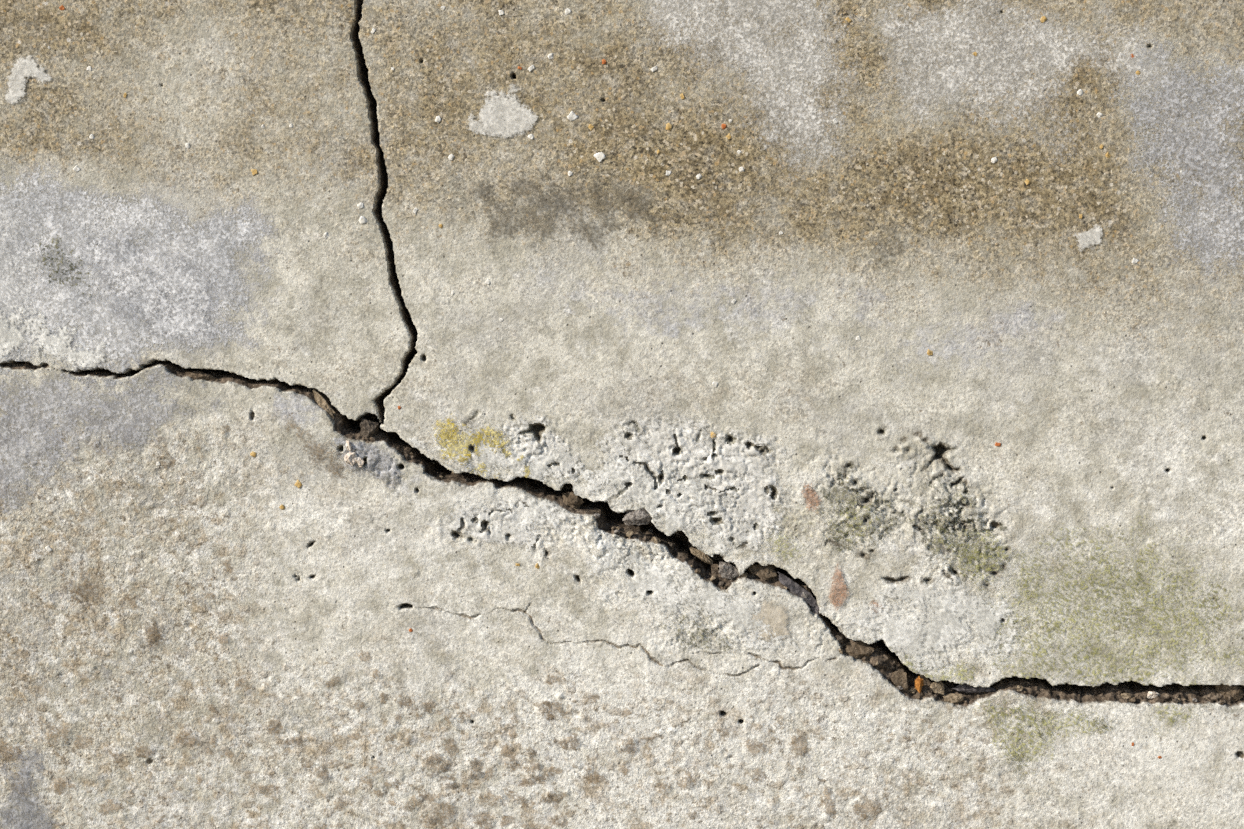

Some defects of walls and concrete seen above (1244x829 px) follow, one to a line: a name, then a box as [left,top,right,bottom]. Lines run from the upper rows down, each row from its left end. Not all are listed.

crack [349,0,418,427]
crack [0,360,1244,710]